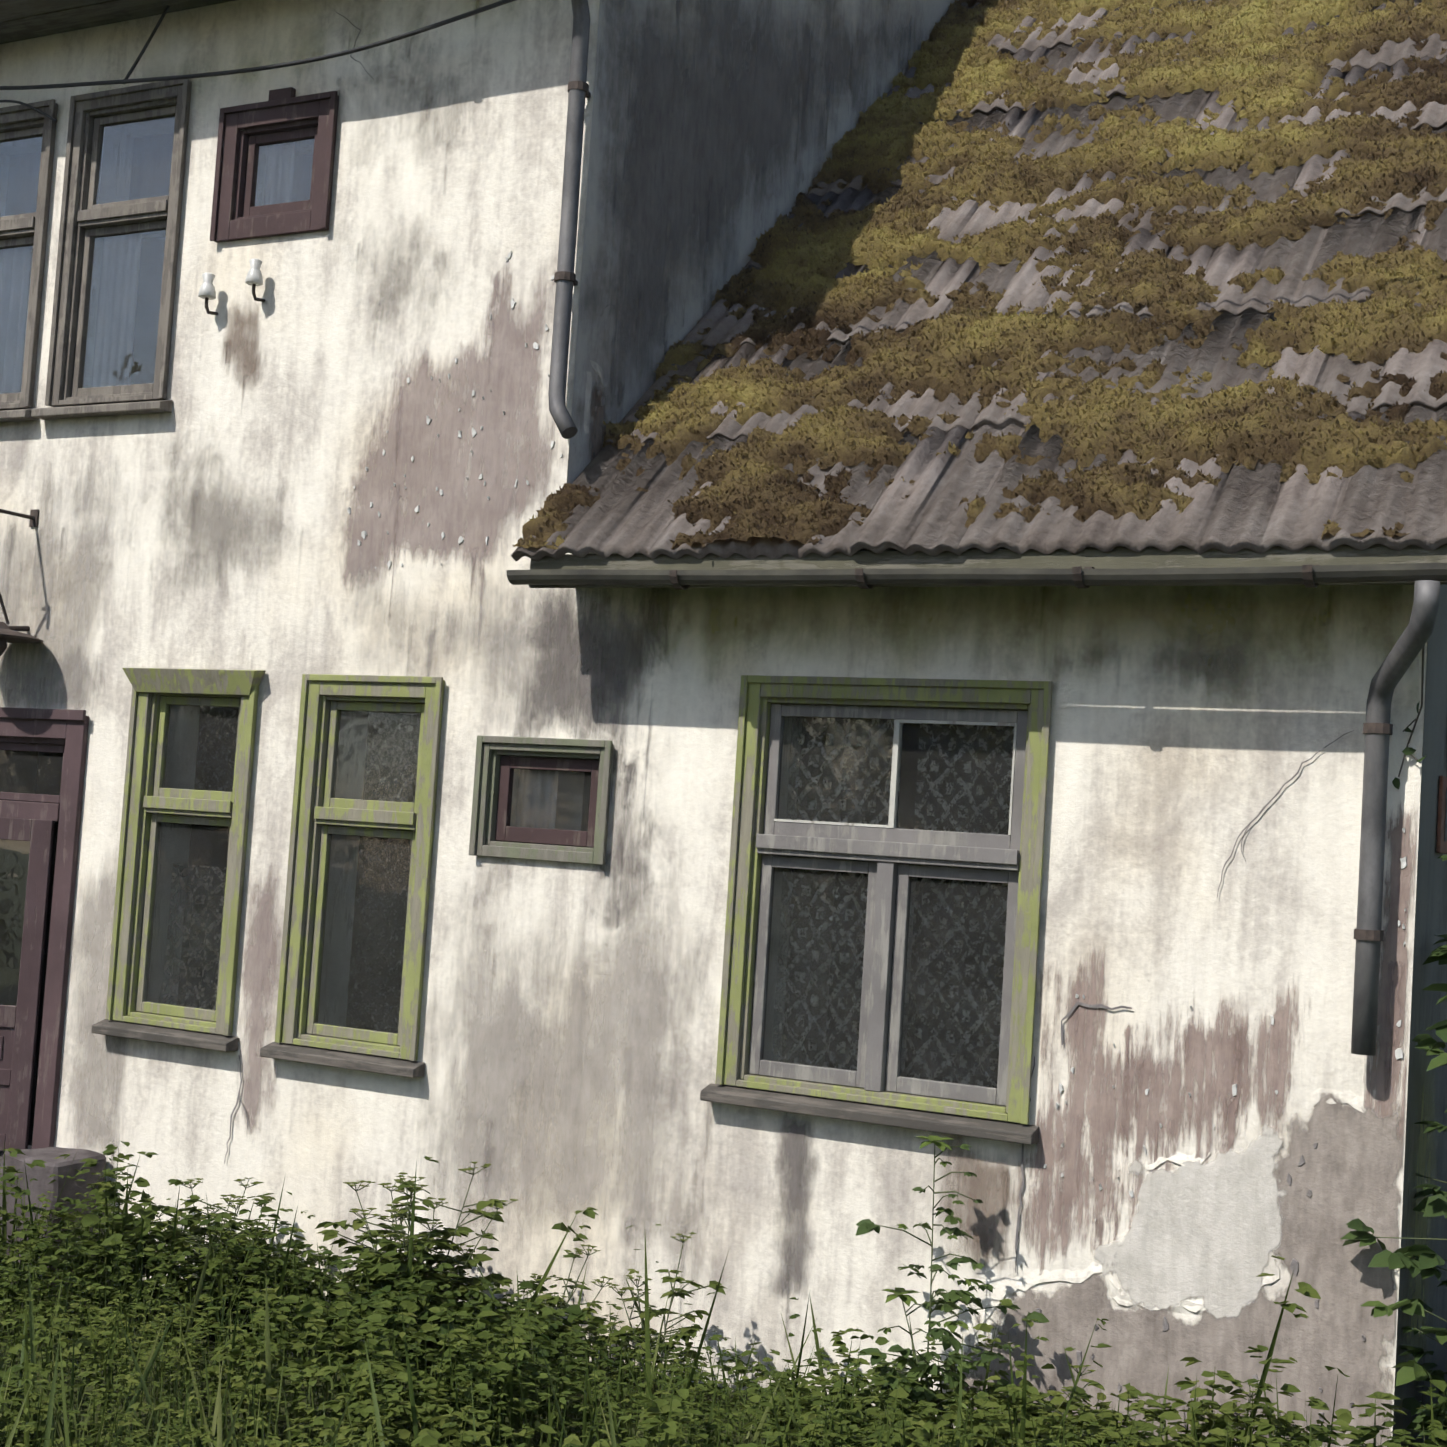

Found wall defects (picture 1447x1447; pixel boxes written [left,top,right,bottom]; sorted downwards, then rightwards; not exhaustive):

water stain [606,0,920,404]
water stain [474,588,670,727]
water stain [624,764,633,808]
crack [1217,730,1354,898]
flaking render [961,807,1416,1447]